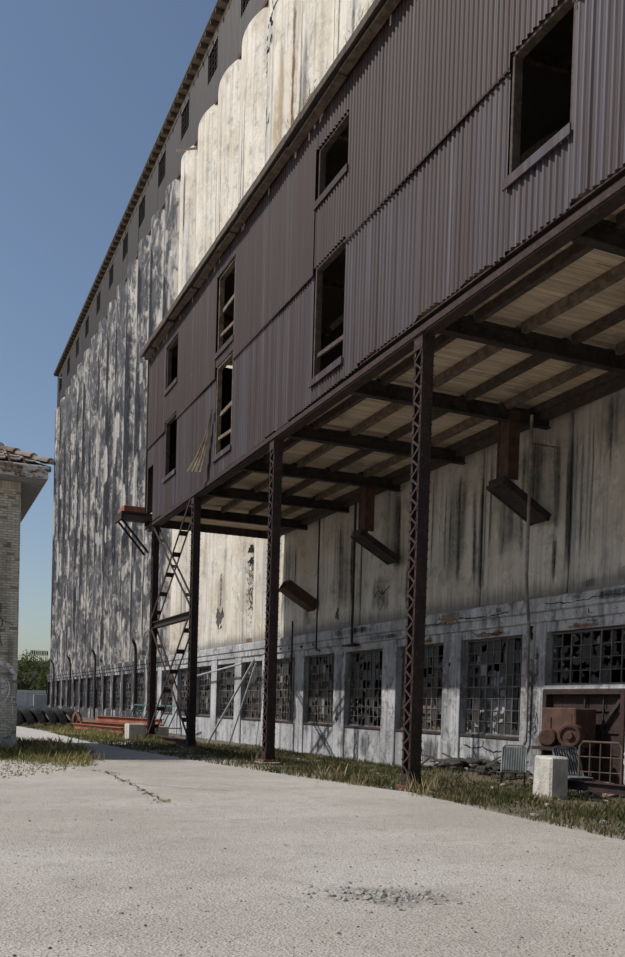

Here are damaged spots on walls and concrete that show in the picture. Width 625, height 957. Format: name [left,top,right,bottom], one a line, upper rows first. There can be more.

water stain [432,485,492,579]
water stain [552,439,594,577]